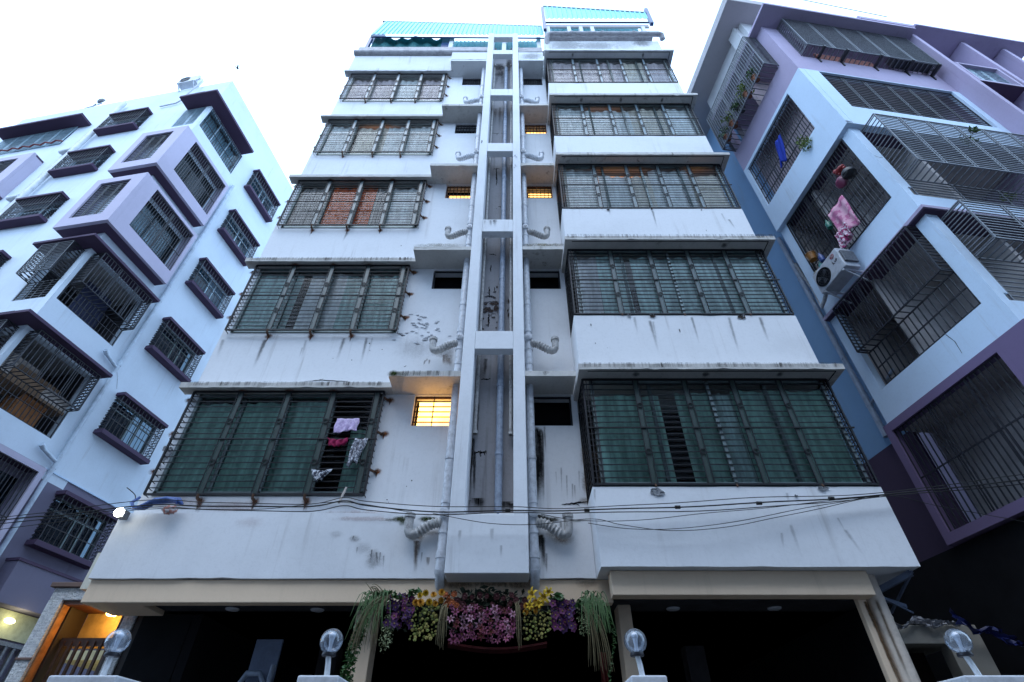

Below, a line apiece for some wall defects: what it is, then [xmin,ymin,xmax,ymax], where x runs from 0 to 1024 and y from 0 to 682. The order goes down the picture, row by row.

peeling [392,314,451,344]
damp [470,405,479,485]
damp [535,428,544,484]